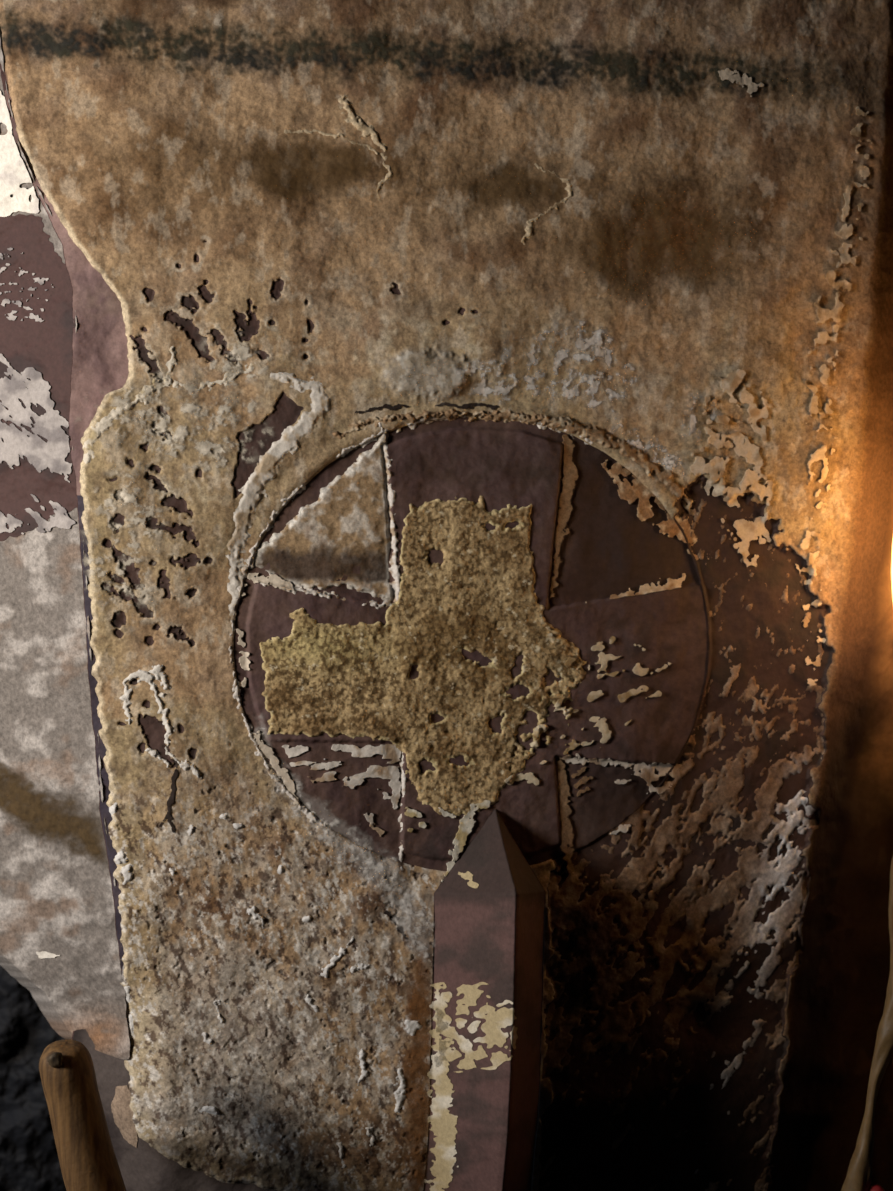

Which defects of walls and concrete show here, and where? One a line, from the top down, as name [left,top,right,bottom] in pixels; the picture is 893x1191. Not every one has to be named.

peeling [718,68,764,97]
flaking render [164,280,275,364]
flaking render [232,392,303,498]
flaking render [0,91,212,1039]
flaking render [239,573,294,597]
flaking render [236,629,251,687]
flaking render [504,106,872,1191]
flaking render [250,731,426,832]
flaking render [438,800,490,888]
flaking render [73,1029,277,1191]
flaking render [394,1068,406,1113]
peeling [404,982,518,1191]